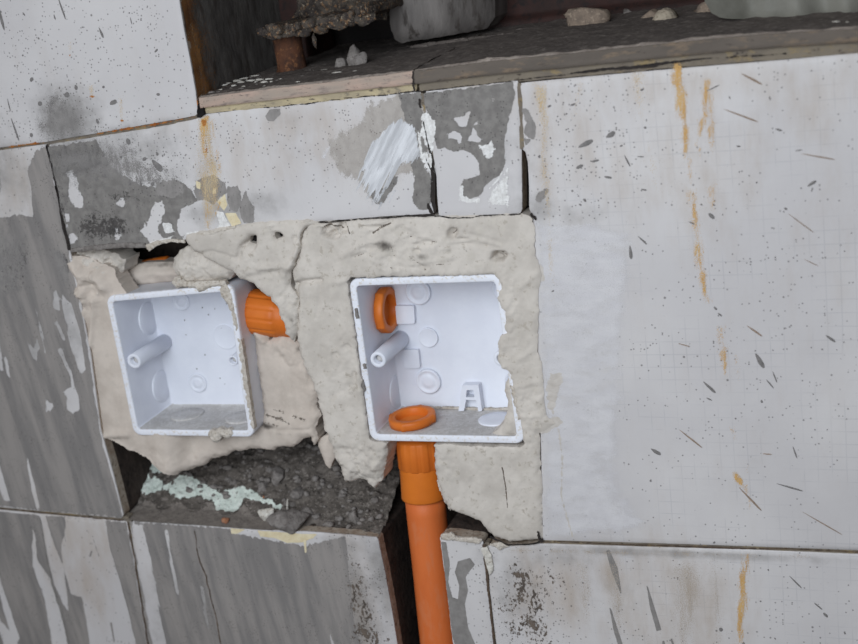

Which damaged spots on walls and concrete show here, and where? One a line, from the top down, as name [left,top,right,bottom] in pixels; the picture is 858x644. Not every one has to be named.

rust [181,0,217,105]
water stain [35,90,193,201]
spalling [70,189,241,252]
rust [97,100,222,229]
crack [263,53,786,223]
rust [669,63,715,302]
peeling [141,464,282,524]
crack [194,531,221,644]
water stain [495,548,648,644]
rust [734,554,750,644]